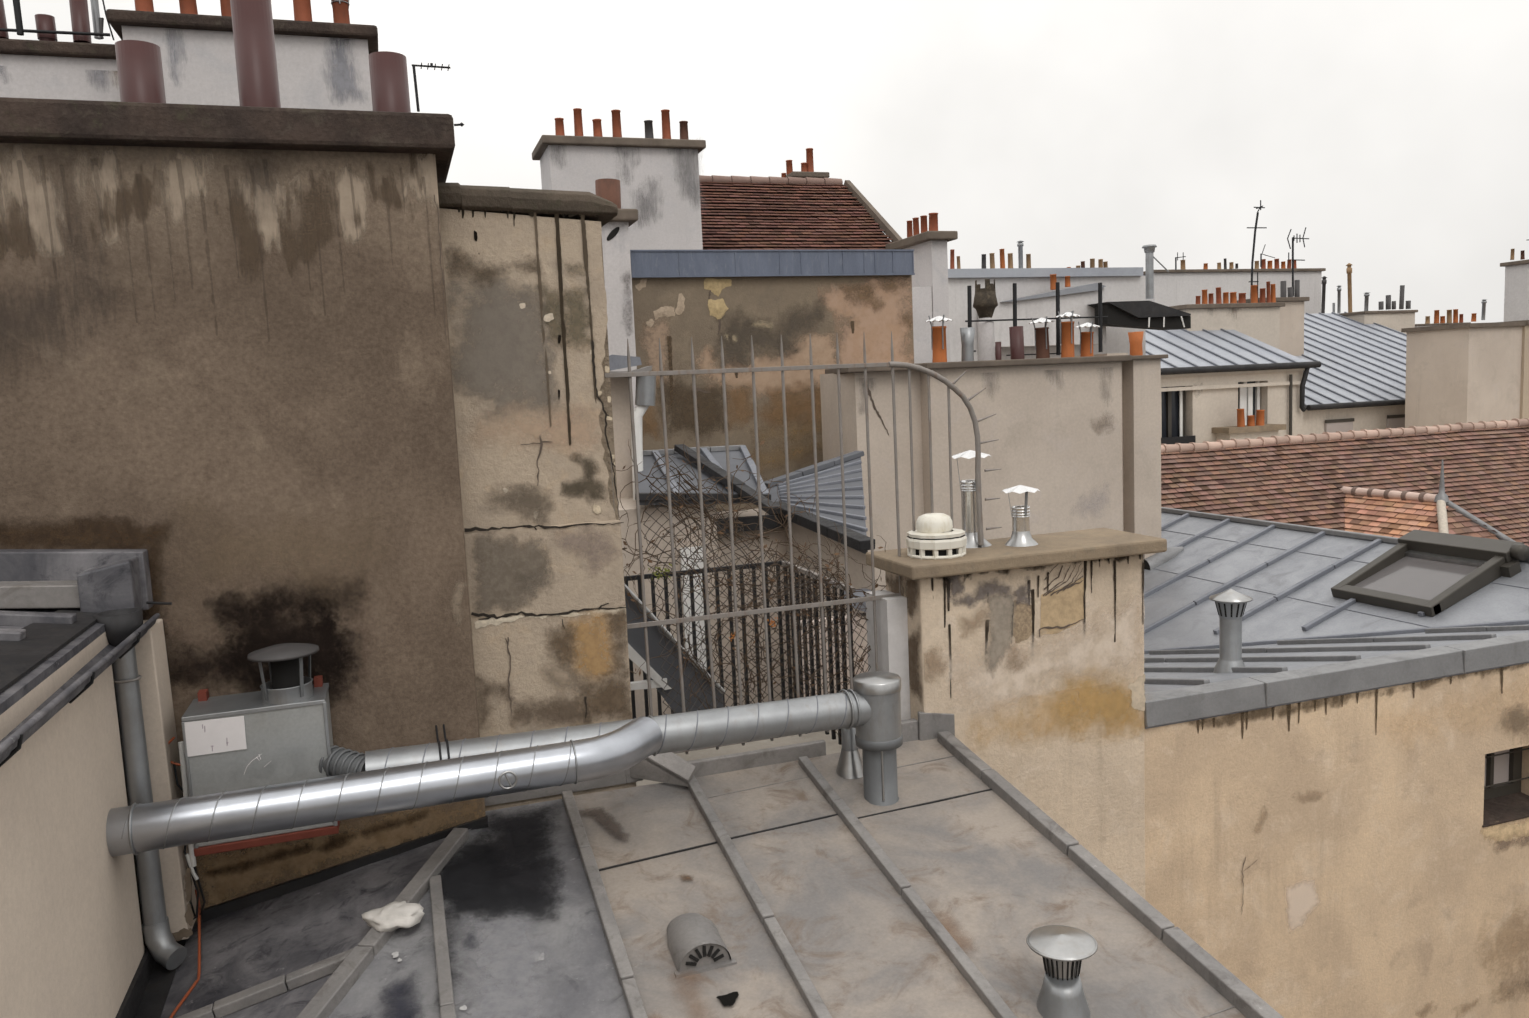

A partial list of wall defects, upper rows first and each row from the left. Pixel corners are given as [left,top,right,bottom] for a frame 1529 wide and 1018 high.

damp [0,146,209,258]
damp [230,154,605,518]
flaking render [642,293,685,383]
flaking render [696,278,914,396]
crack [521,436,551,486]
crack [465,522,624,532]
damp [477,609,632,723]
damp [1272,689,1378,732]